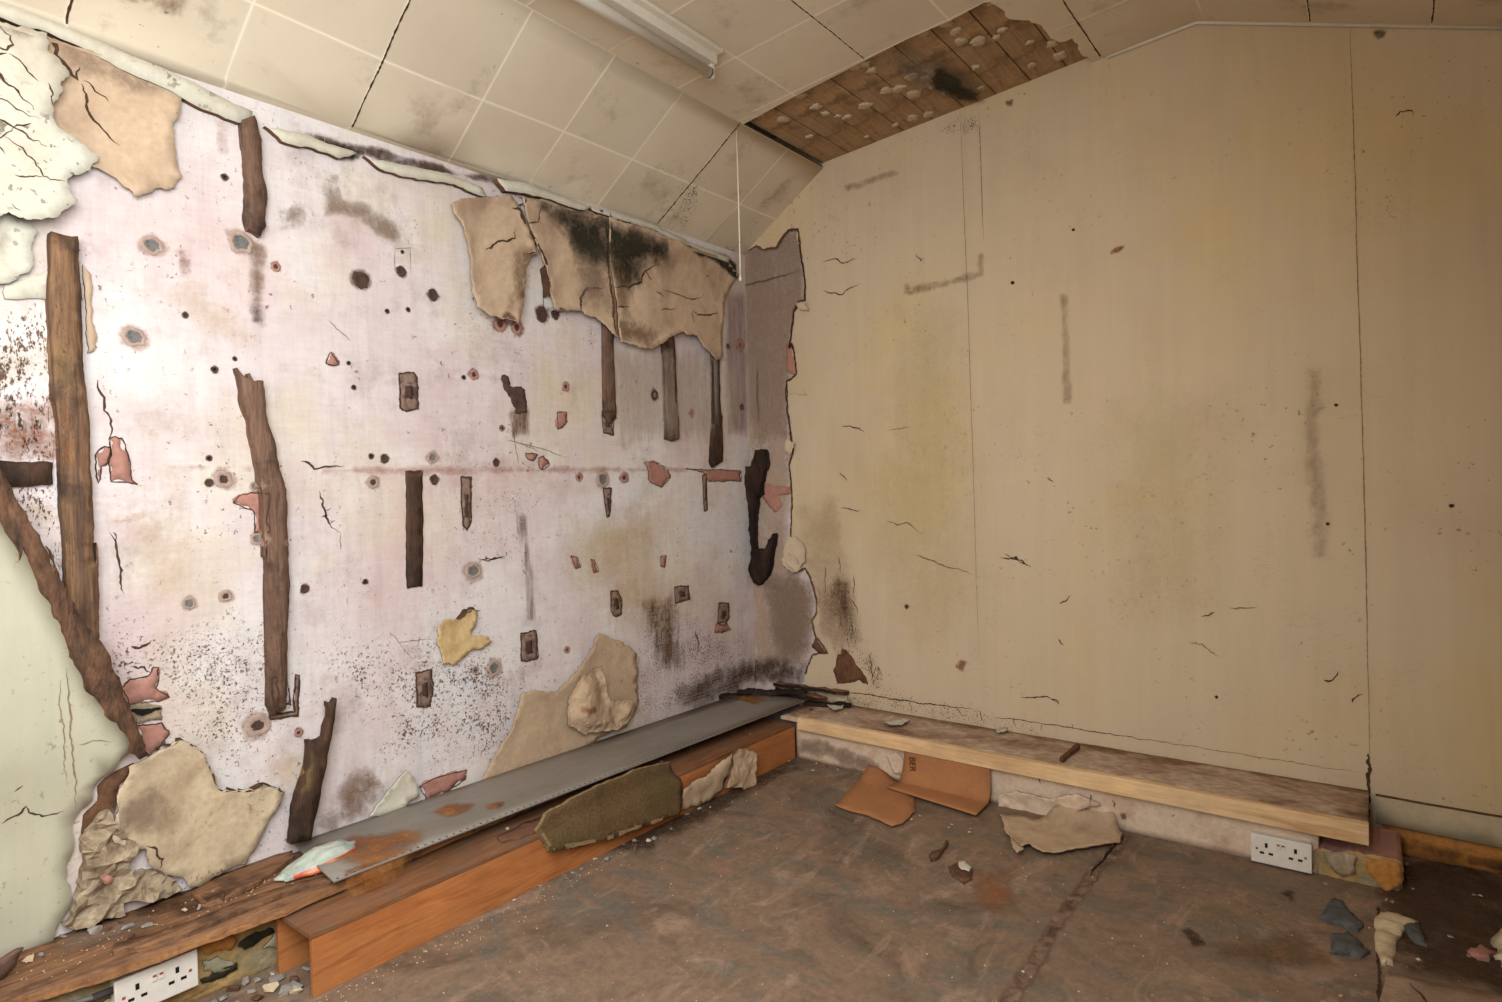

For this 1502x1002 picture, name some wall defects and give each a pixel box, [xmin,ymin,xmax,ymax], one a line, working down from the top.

crack [0,0,119,210]
leakage [901,57,979,142]
spalling [351,270,370,289]
spalling [493,306,564,336]
leakage [541,184,708,340]
spalling [94,436,138,485]
spalling [204,455,271,545]
leakage [634,193,809,724]
peeling [644,228,828,733]
peeling [61,666,285,930]
peeling [368,633,639,817]
leakage [825,577,1031,732]